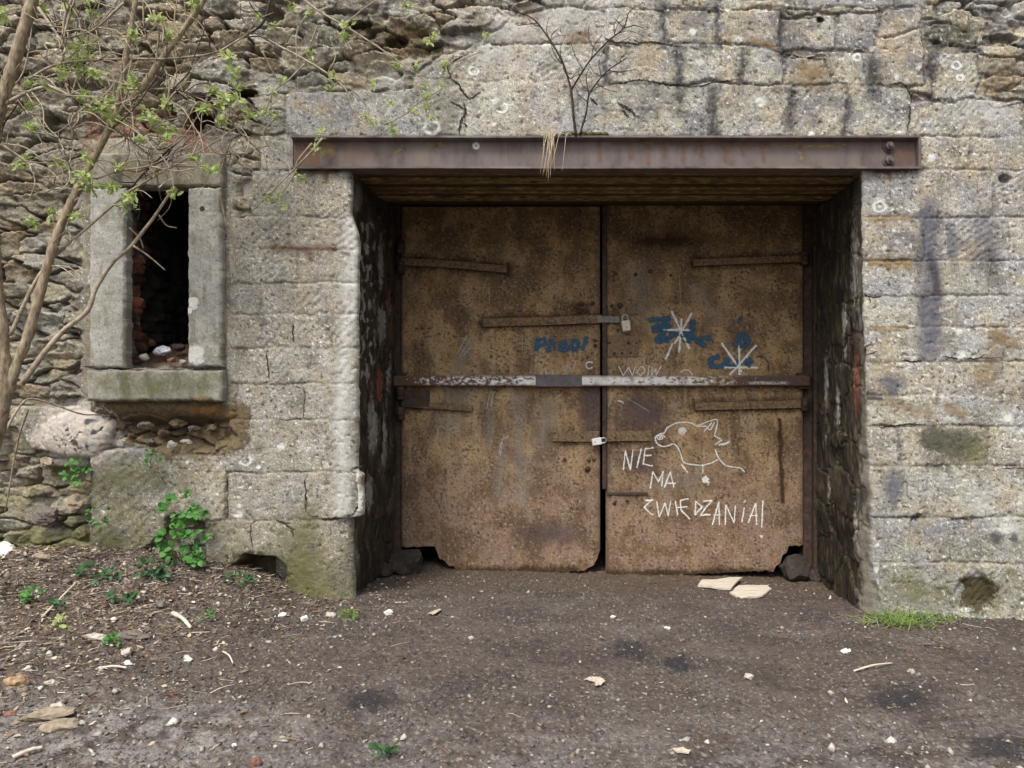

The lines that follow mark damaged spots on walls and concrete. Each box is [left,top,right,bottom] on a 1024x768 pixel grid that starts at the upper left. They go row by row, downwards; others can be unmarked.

crack [601,78,738,90]
corrosion [296,142,337,180]
corrosion [598,141,846,163]
corrosion [877,146,909,180]
damp [920,201,956,355]
spalling [91,396,251,461]
corrosion [564,386,599,445]
corrosion [615,393,671,431]
corrosion [621,444,655,471]
corrosion [692,397,801,503]
spalling [226,550,276,574]
spalling [955,569,1000,616]